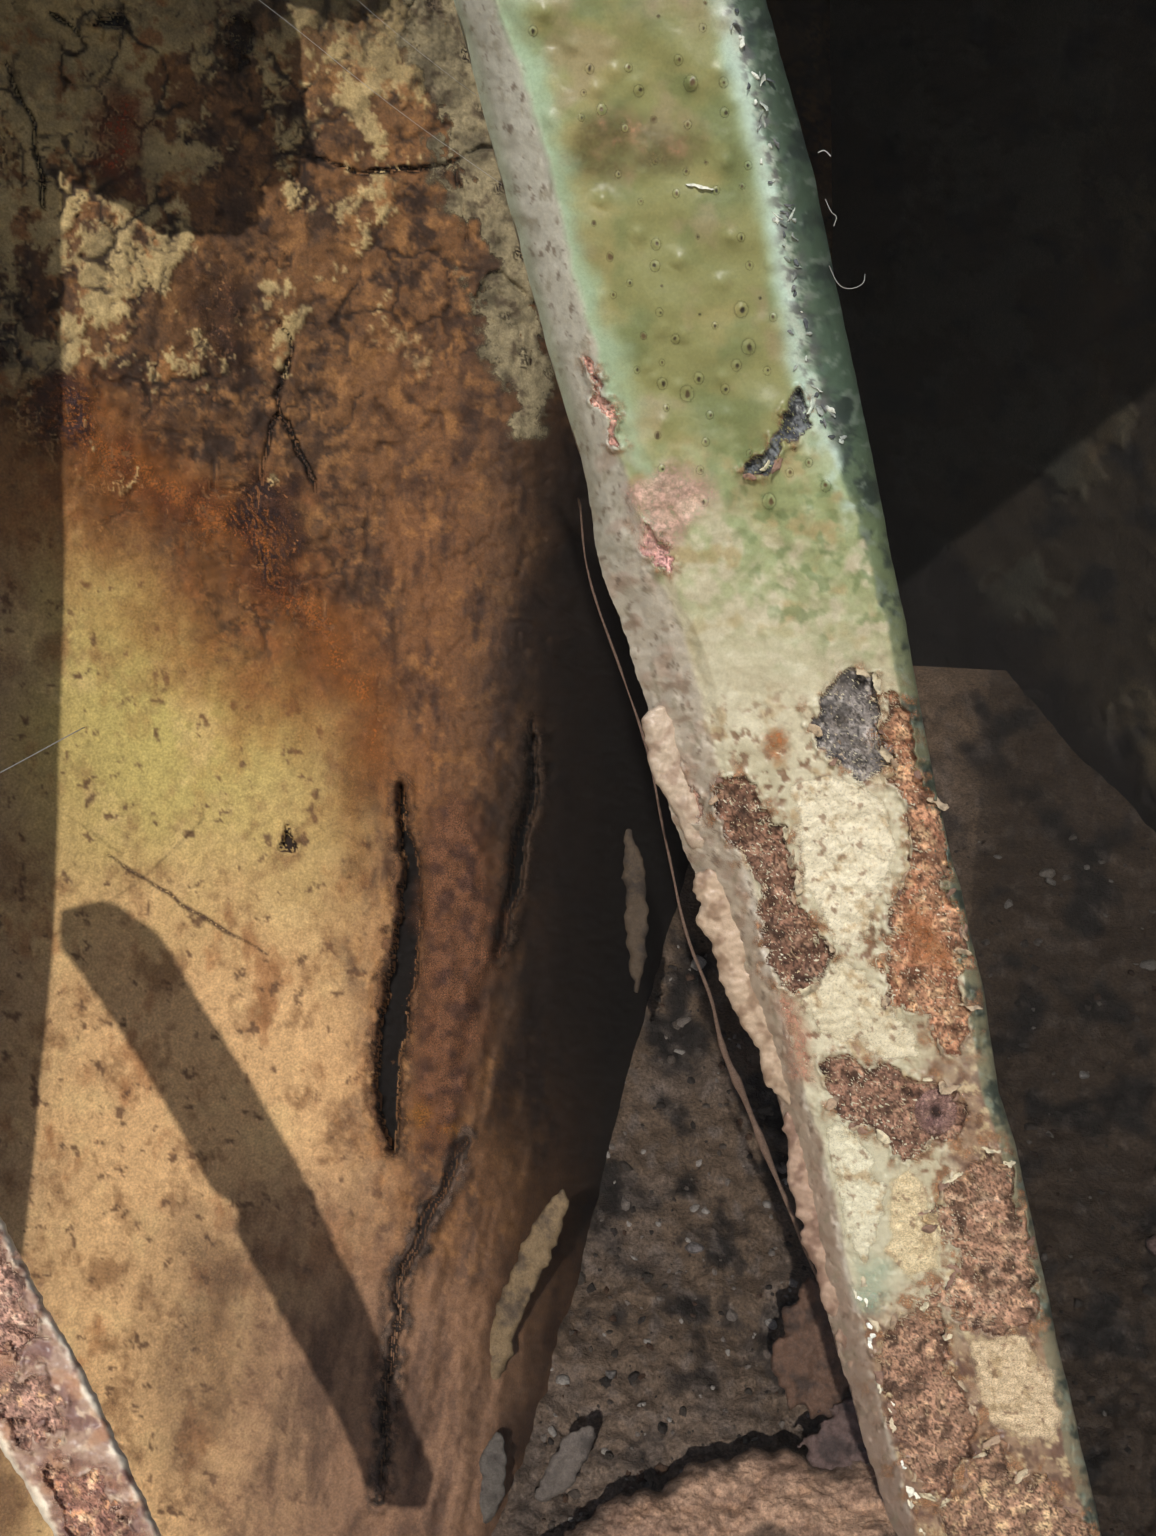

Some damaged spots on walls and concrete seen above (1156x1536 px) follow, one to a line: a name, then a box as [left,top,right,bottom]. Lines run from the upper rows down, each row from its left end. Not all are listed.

peeling [730,8,745,48]
peeling [747,71,780,184]
crack [314,156,469,241]
corrosion [182,270,245,362]
crack [255,321,316,497]
peeling [807,385,847,444]
corrosion [225,467,310,591]
crack [486,712,549,971]
crack [365,774,477,1506]
spalling [797,666,1100,1536]
corrosion [0,1217,162,1536]
corrosion [564,1446,898,1536]